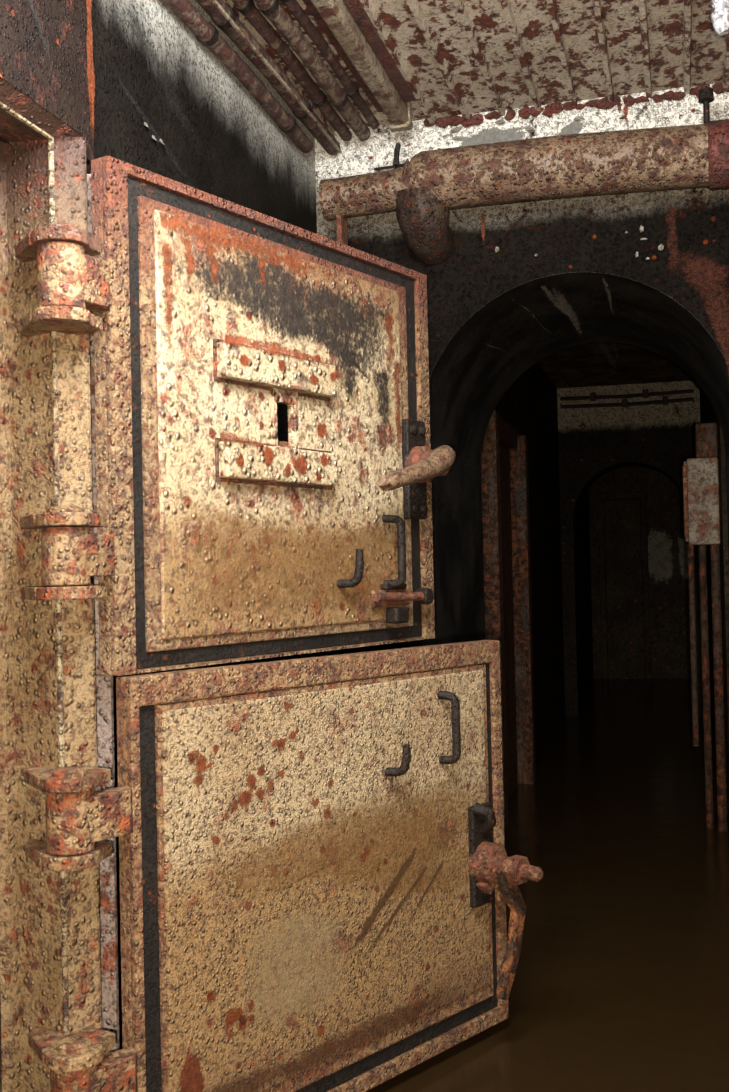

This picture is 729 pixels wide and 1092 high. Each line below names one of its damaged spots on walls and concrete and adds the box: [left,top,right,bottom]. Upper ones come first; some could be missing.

rust [424,82,729,128]
rust [665,204,729,374]